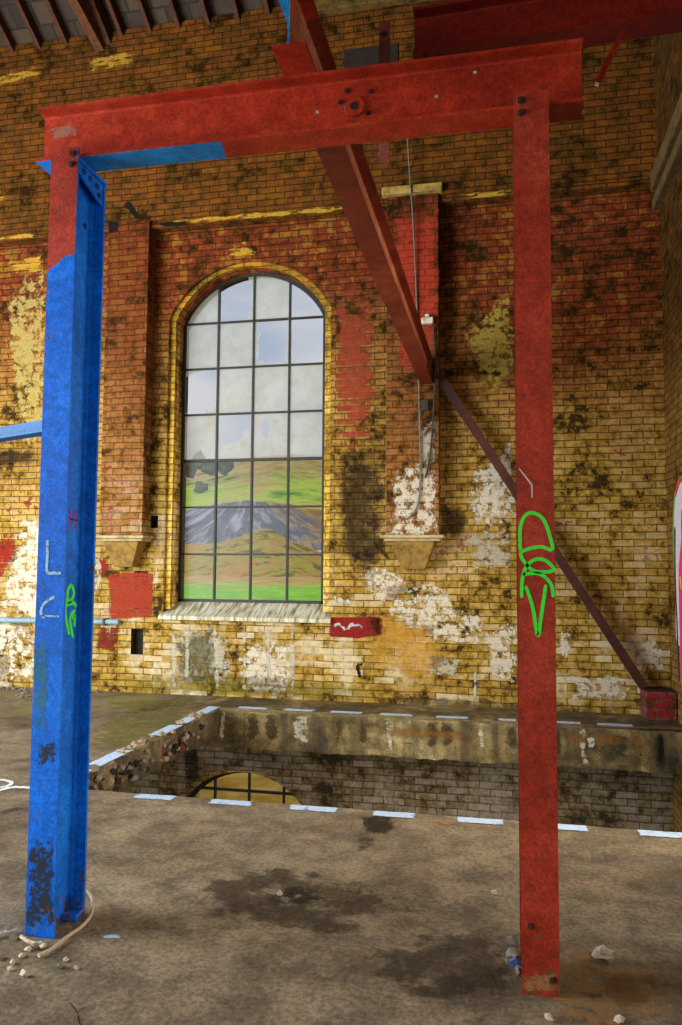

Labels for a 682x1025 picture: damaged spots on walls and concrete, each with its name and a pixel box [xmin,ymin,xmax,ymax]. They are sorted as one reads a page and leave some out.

peeling [0,533,20,577]
damp [341,421,517,682]
flaking render [329,616,444,676]
spalling [88,712,205,792]
damp [247,715,278,739]
damp [293,716,309,742]
damp [427,723,453,747]
rust [26,839,54,927]